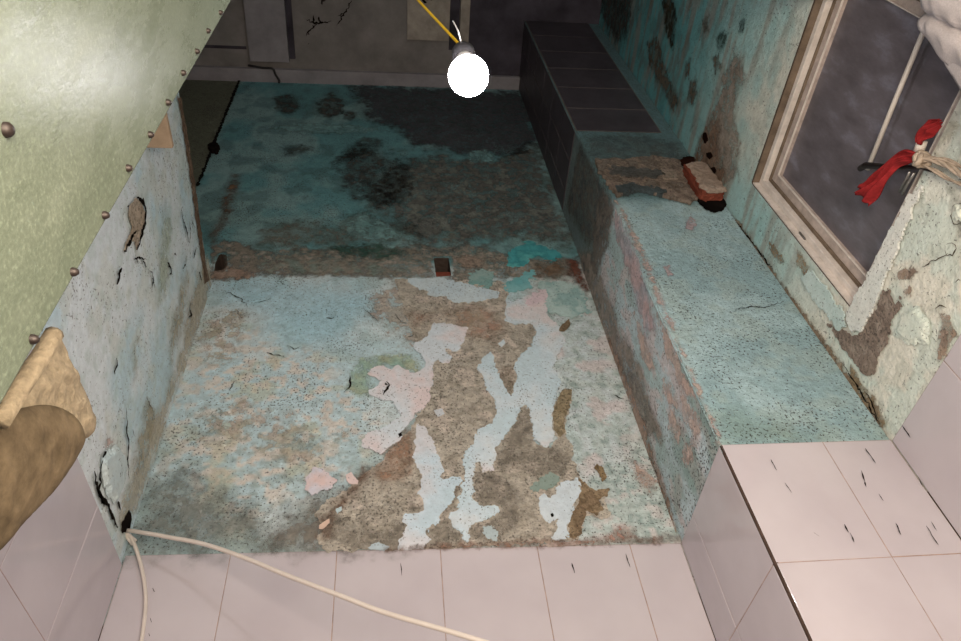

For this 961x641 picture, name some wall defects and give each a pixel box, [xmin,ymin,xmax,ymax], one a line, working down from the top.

crack [306,0,352,44]
damp [601,0,631,42]
damp [647,0,697,111]
damp [713,31,727,74]
spalling [124,196,147,252]
peeling [177,97,611,553]
damp [259,85,681,535]
peeling [595,155,924,464]
peeling [937,314,957,360]